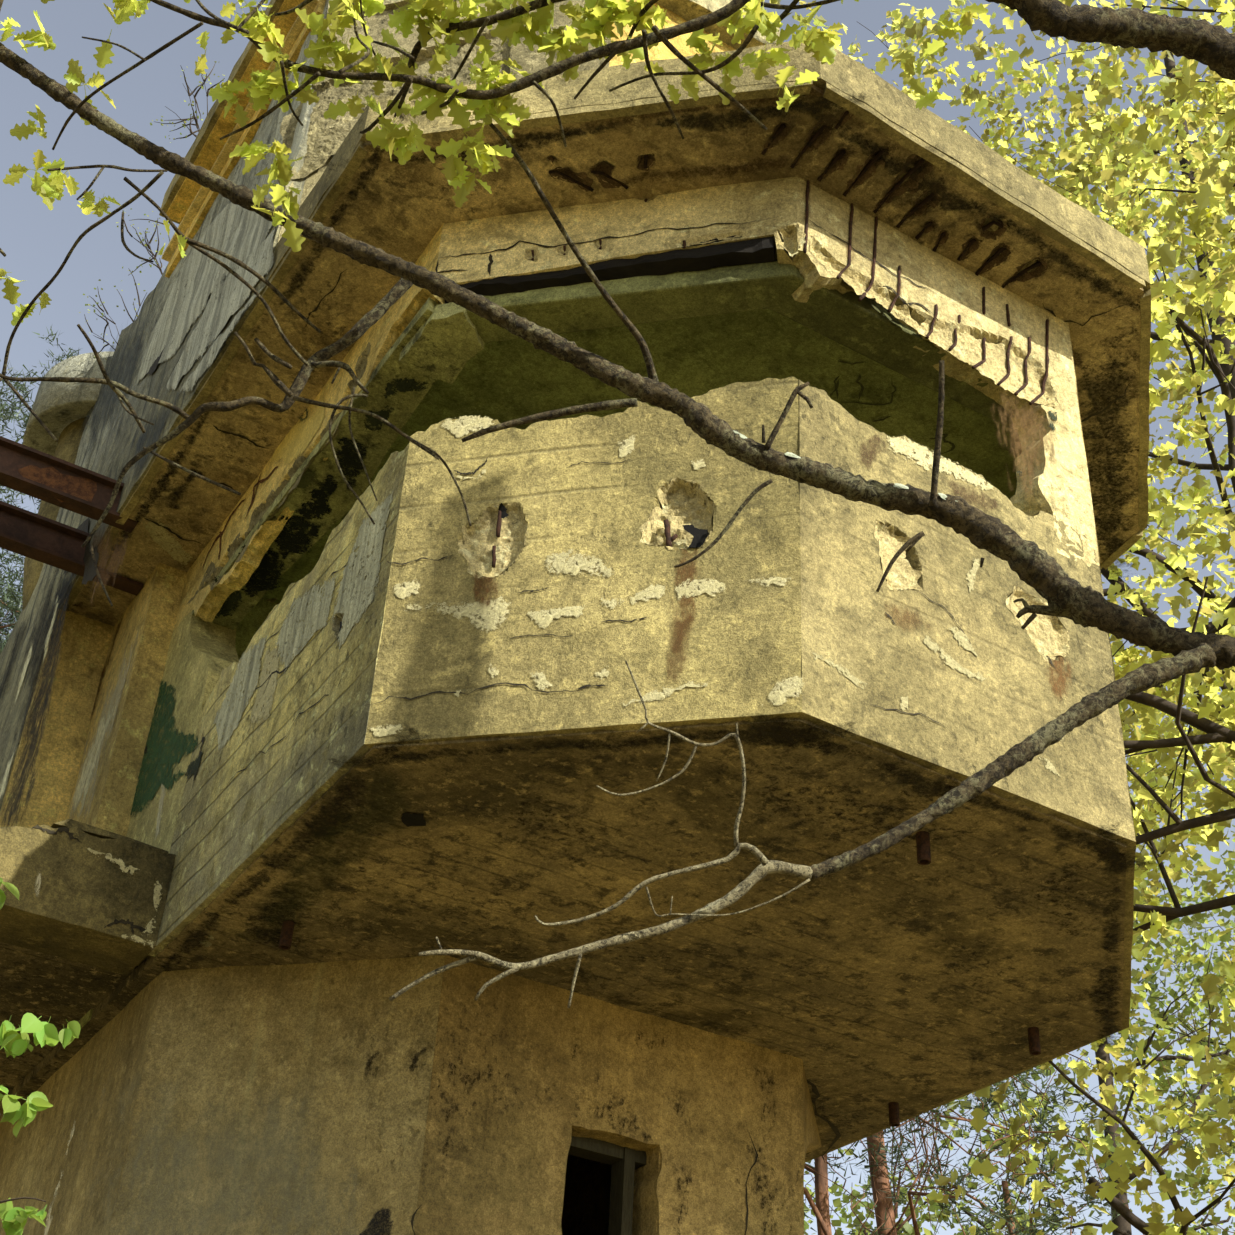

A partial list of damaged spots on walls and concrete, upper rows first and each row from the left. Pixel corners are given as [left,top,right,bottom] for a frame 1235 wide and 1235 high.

spalling [778,141,1059,493]
peeling [214,491,393,755]
spalling [392,502,529,633]
peeling [601,578,726,609]
spalling [639,459,715,550]
rust [667,549,696,678]
spalling [1006,585,1070,666]
water stain [1073,330,1139,581]
crack [368,682,605,705]
water stain [159,714,955,971]
water stain [967,797,1153,1047]
crack [745,1125,758,1235]